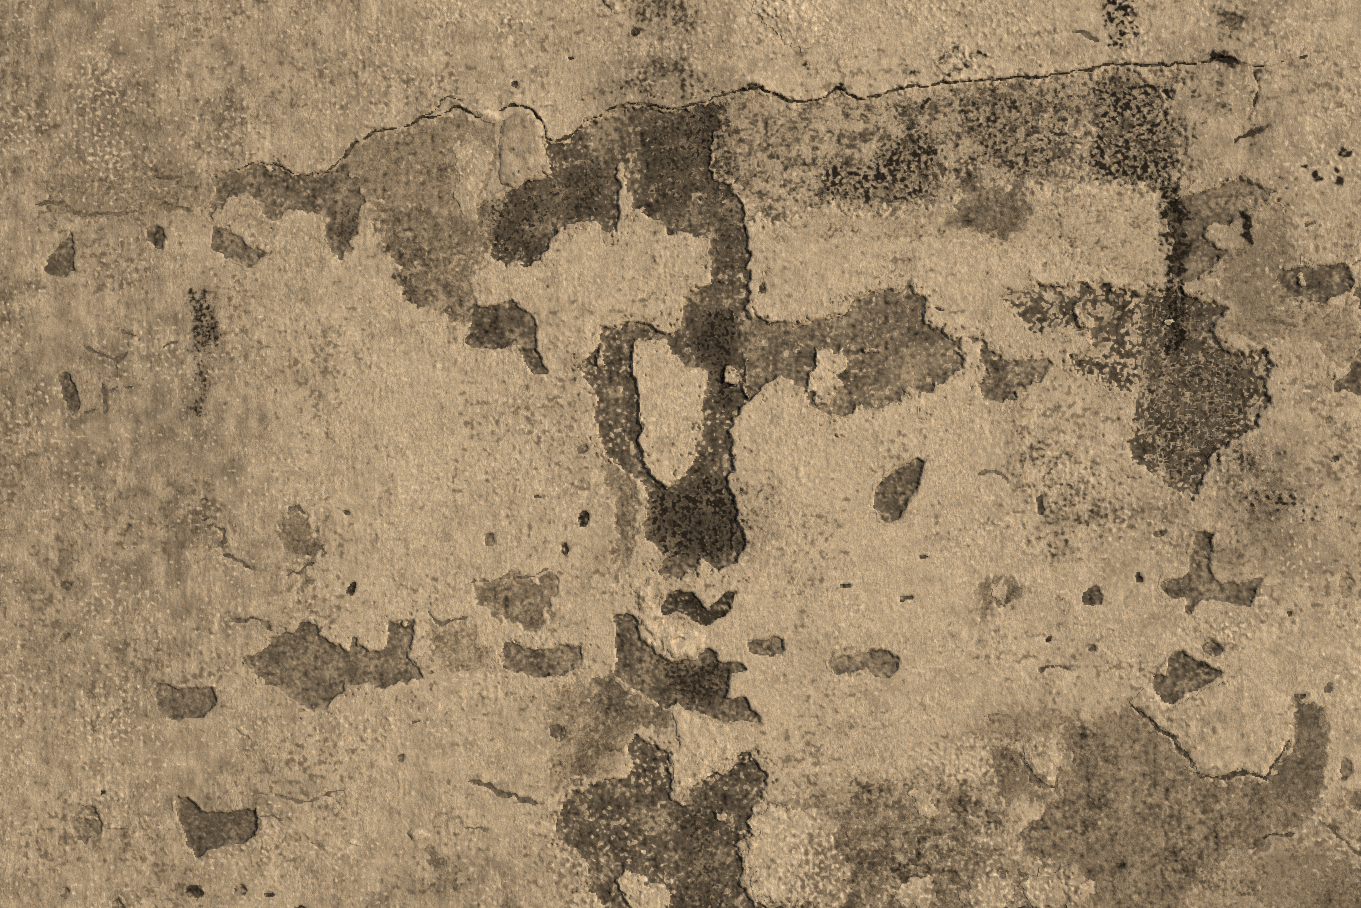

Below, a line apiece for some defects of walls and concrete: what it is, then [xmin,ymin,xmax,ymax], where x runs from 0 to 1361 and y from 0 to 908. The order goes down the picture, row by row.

crack [238,30,1308,176]
flaking render [1268,238,1361,314]
flaking render [453,86,1289,626]
flaking render [1323,346,1361,395]
flaking render [149,681,220,721]
flaking render [219,599,424,723]
flaking render [488,634,592,682]
flaking render [608,613,786,727]
crack [1130,706,1290,781]
flaking render [1130,637,1306,776]
flaking render [171,795,259,862]
flaking render [547,734,782,908]